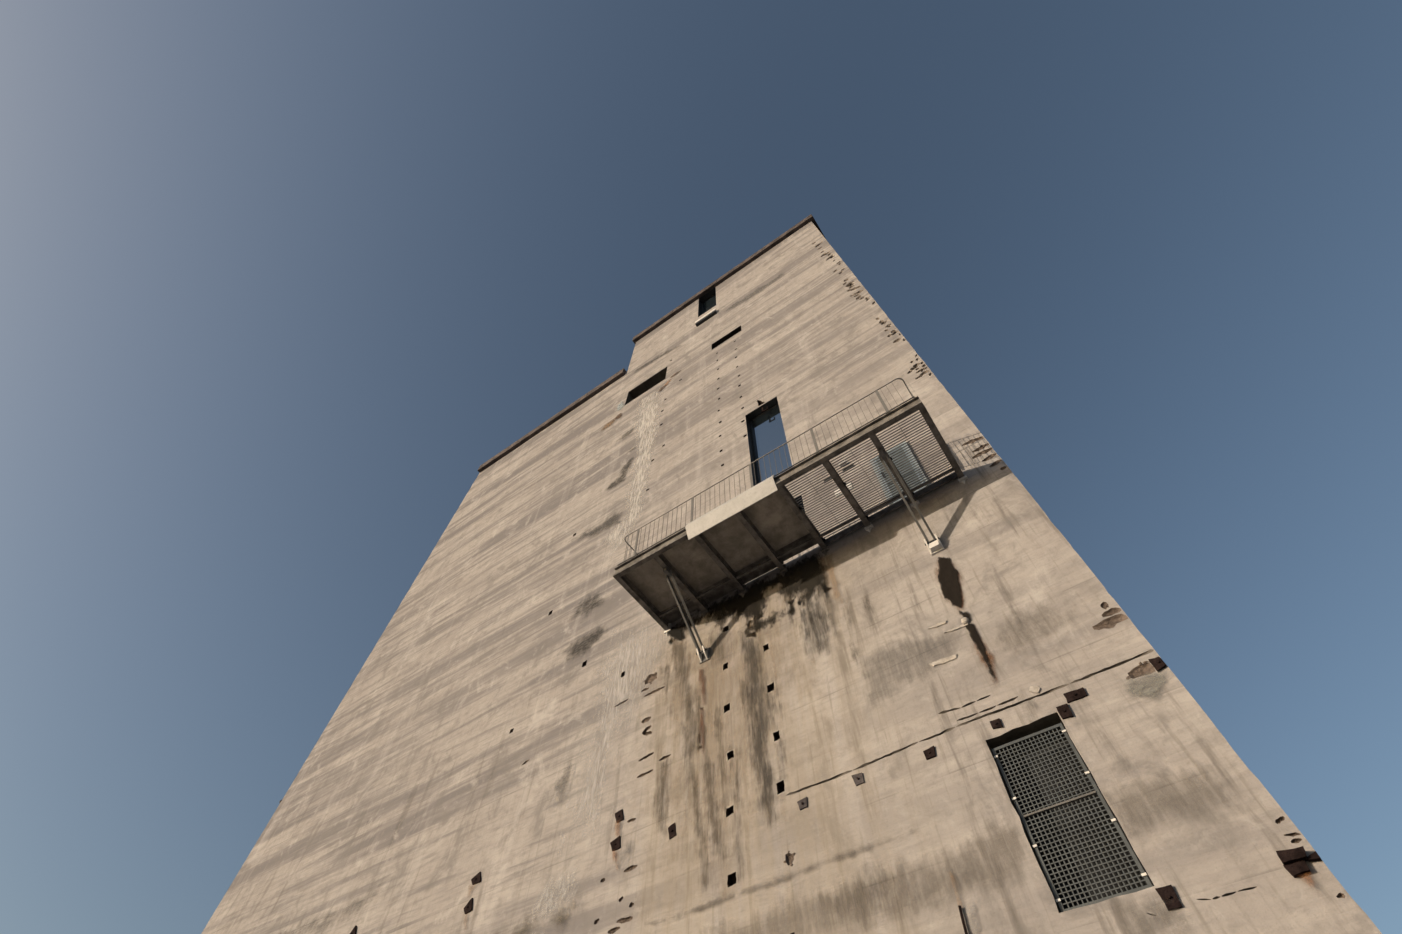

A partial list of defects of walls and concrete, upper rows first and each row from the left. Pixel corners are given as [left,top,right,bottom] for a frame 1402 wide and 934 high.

water stain [568,629,603,656]
water stain [580,553,829,819]